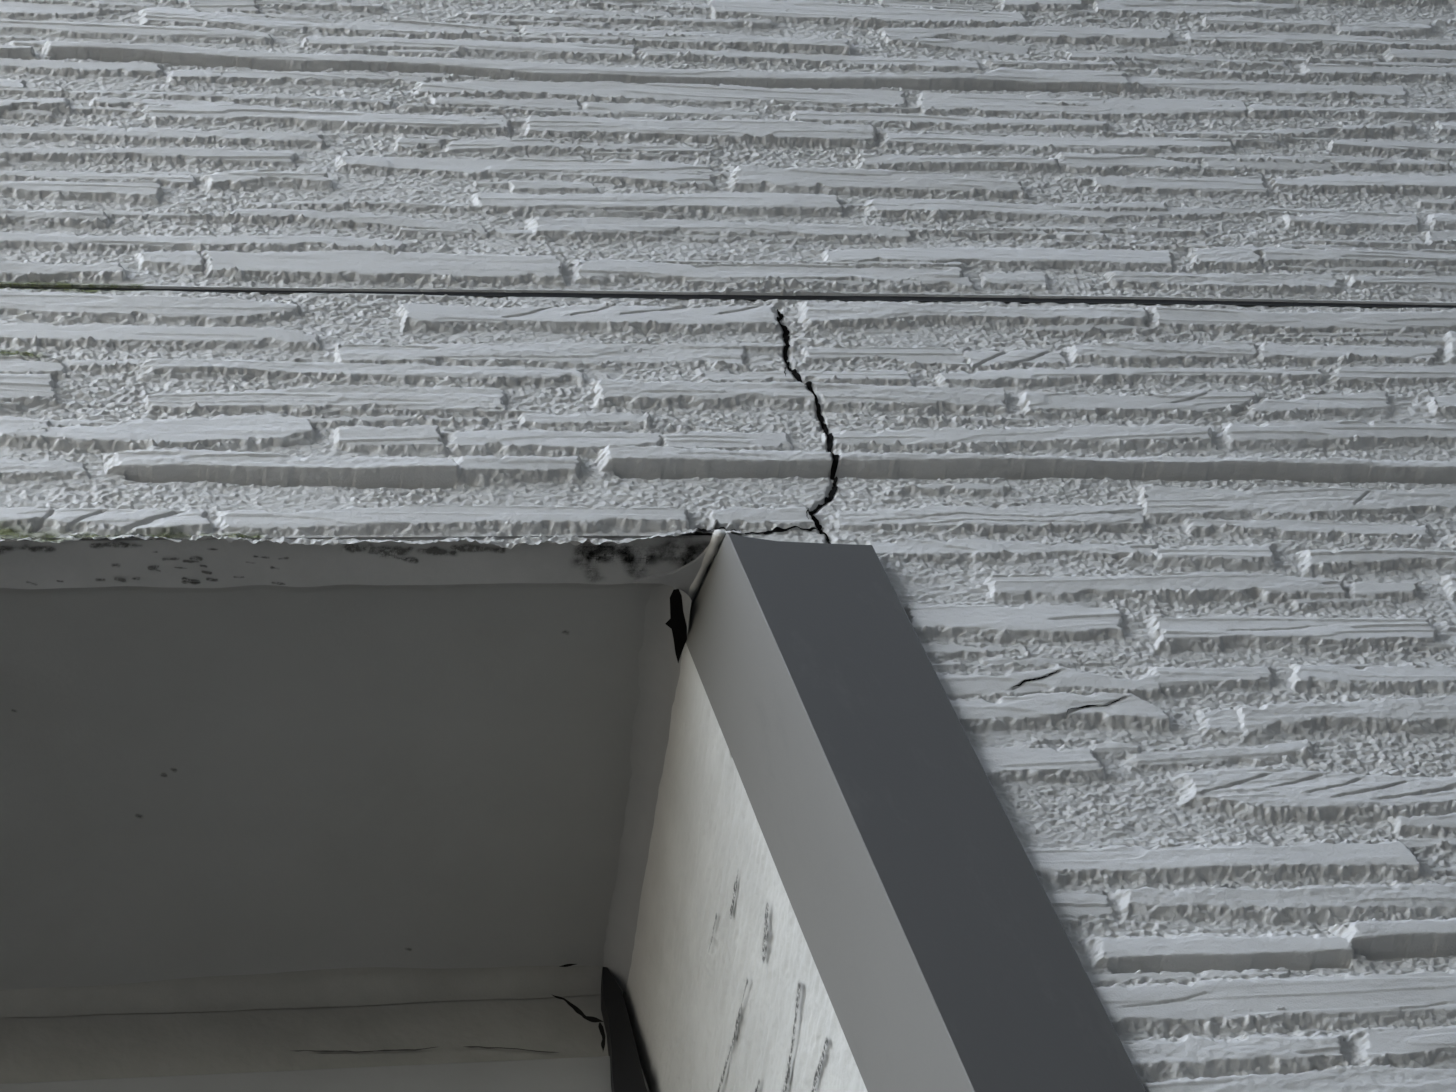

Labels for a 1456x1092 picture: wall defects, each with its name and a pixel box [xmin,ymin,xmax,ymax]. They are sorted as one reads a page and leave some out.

crack [718,309,839,544]
crack [665,589,687,663]
crack [551,964,606,1051]